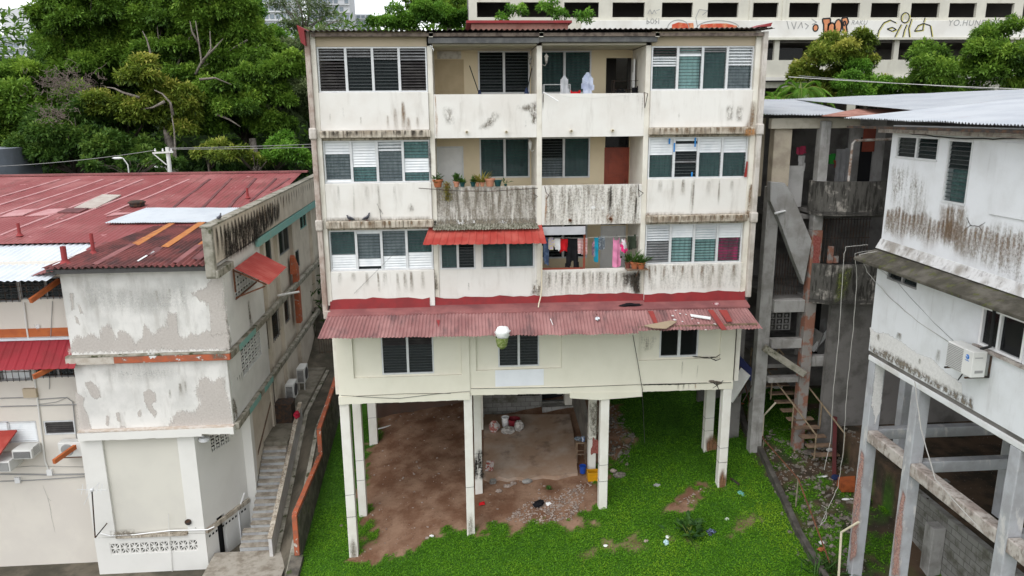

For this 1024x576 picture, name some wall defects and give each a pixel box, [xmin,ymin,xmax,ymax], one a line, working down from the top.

leakage [216,184,310,259]
leakage [330,185,700,225]
leakage [886,182,1024,261]
leakage [576,267,650,294]
peeling [68,277,230,360]
peeling [75,381,101,430]
peeling [138,390,157,417]
peeling [169,377,235,435]